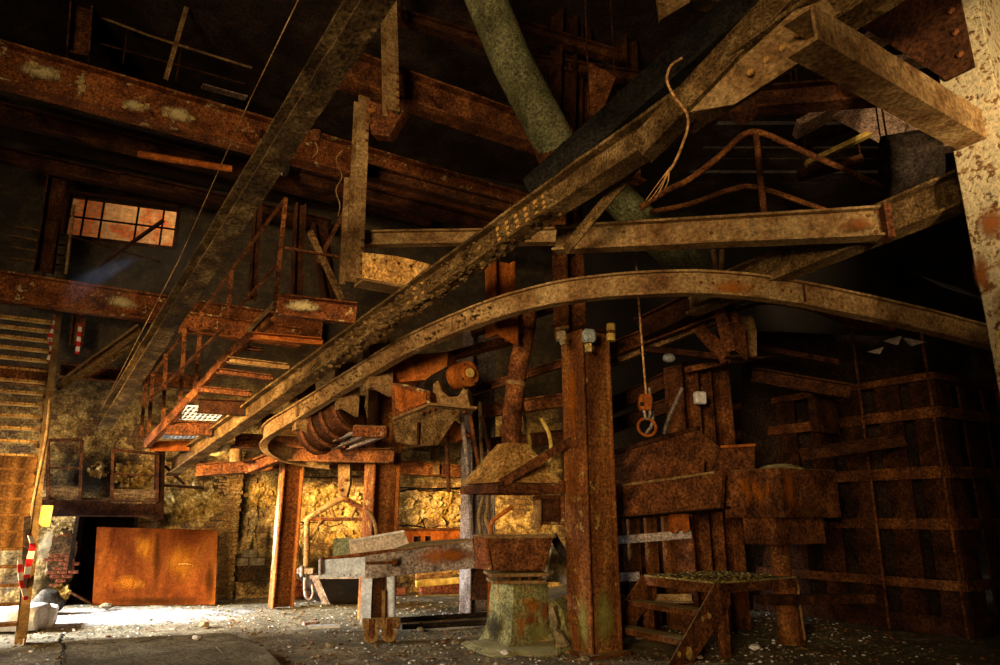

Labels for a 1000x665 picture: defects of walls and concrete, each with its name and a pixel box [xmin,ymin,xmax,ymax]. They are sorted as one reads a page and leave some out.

rust [980,208,1000,236]
rust [289,301,318,310]